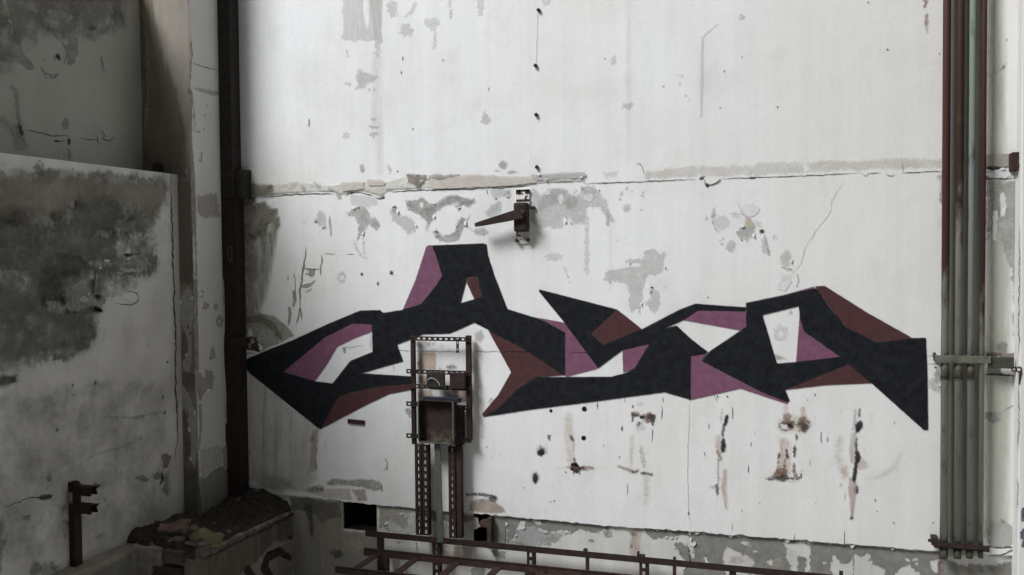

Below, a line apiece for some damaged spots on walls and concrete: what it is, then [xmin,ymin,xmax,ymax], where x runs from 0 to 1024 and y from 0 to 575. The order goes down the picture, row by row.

peeling [341,0,416,57]
leakage [0,0,191,385]
peeling [175,41,227,468]
spalling [388,166,486,241]
peeling [530,172,612,228]
peeling [604,249,665,313]
crack [588,177,695,185]
crack [729,163,942,290]
rust [779,415,810,440]
spalling [377,505,480,538]
spalling [505,516,613,546]
spalling [643,528,1012,575]